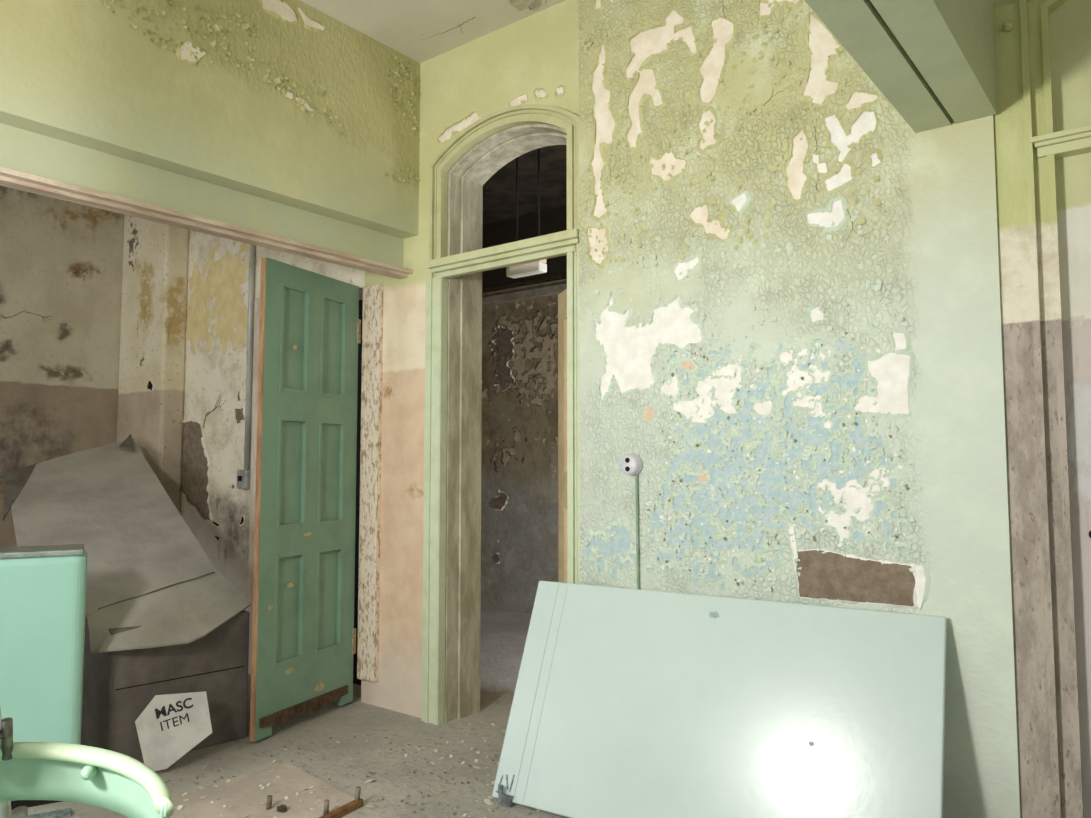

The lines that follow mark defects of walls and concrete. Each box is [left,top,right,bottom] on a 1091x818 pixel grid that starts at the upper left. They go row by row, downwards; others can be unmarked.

peeling [259,0,325,33]
peeling [508,85,566,107]
peeling [437,111,484,144]
peeling [580,0,931,610]
mould [42,367,82,379]
peeling [489,310,558,415]
flaking render [181,418,220,541]
flaking render [490,490,509,511]